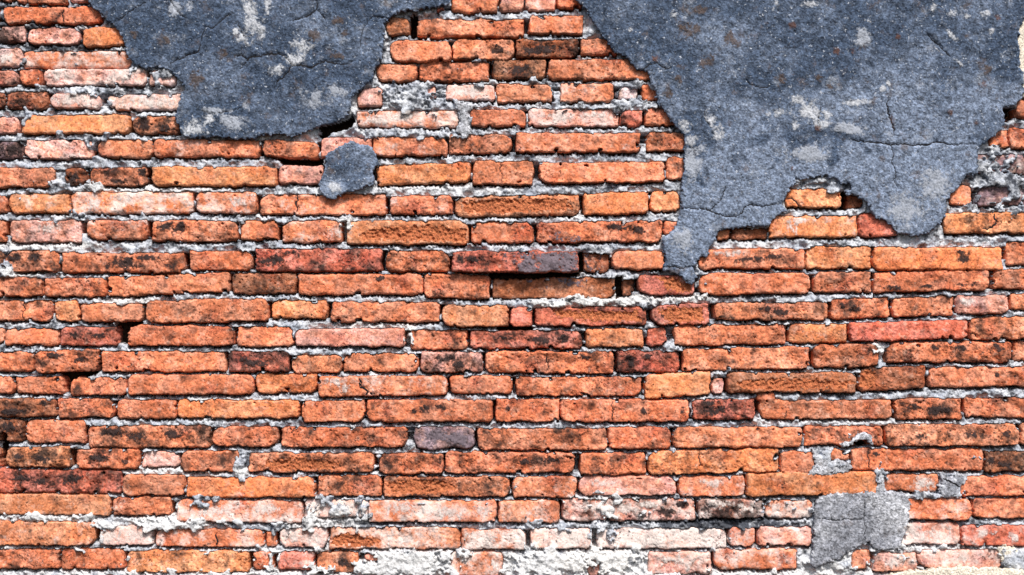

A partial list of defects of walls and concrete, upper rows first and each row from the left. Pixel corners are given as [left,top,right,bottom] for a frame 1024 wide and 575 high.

crack [853,98,976,186]
spalling [462,197,573,214]
crack [682,185,799,217]
spalling [359,224,467,243]
spalling [656,277,692,293]
spalling [553,309,642,322]
spalling [657,306,705,323]
spalling [737,369,878,392]
spalling [265,455,342,472]
spalling [388,478,458,495]
spalling [330,532,381,548]